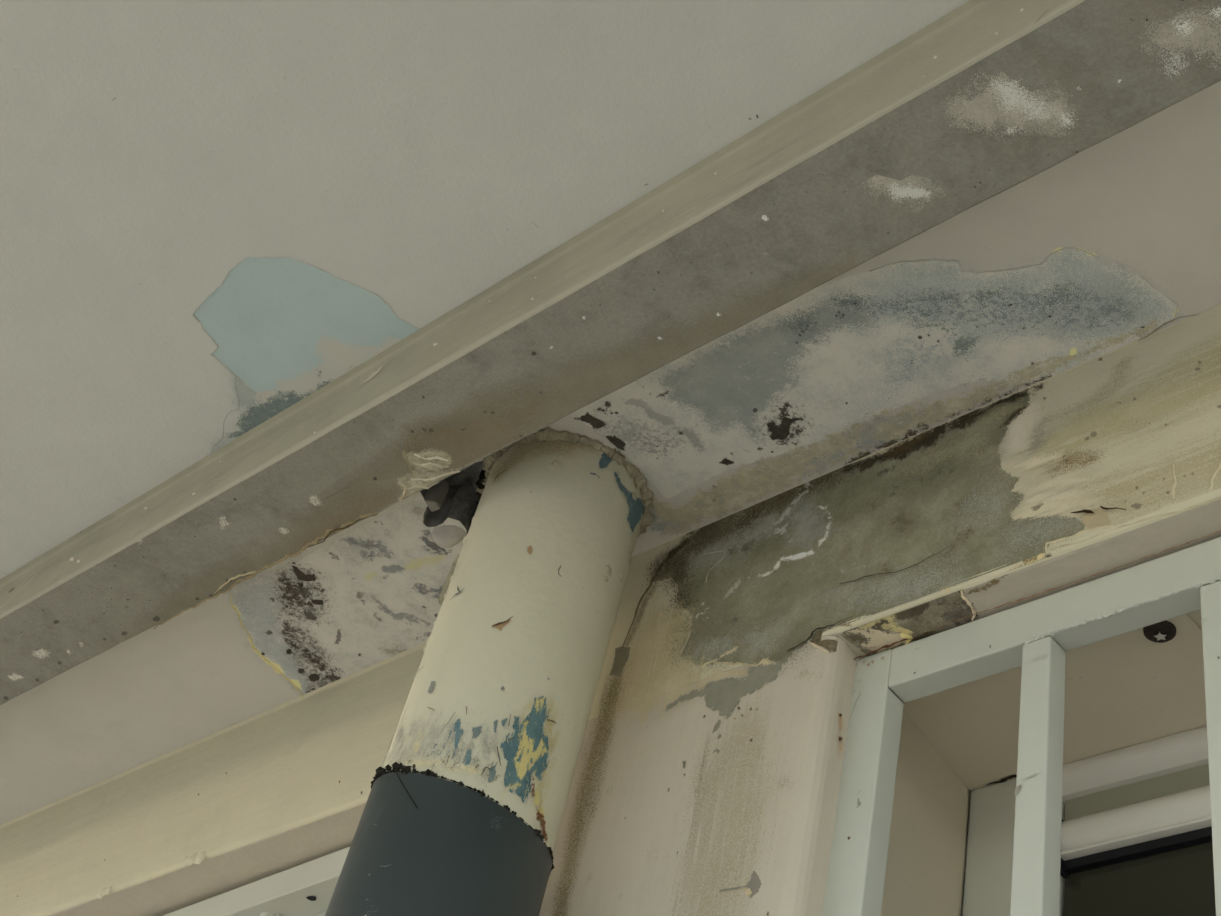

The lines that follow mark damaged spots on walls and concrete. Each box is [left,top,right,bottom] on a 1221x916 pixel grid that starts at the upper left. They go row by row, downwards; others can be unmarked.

water stain [859,0,1221,230]
peeling [192,256,420,407]
peeling [153,447,489,697]
water stain [97,242,1221,693]
spalling [571,243,1221,753]
peeling [385,677,564,827]
water stain [531,775,548,843]
water stain [550,593,721,916]
water stain [647,666,827,916]